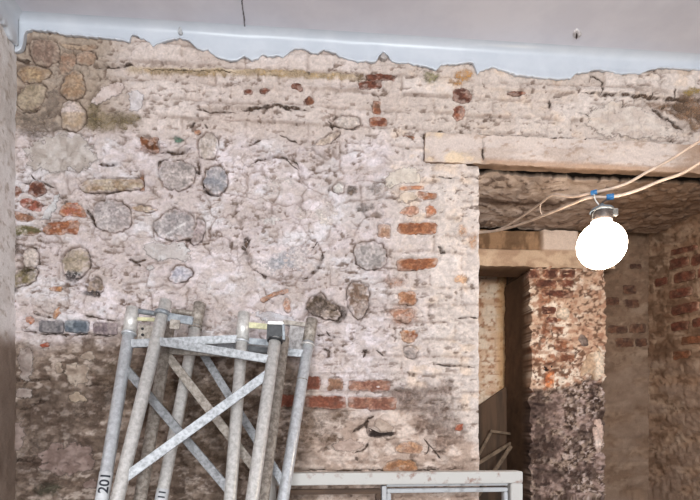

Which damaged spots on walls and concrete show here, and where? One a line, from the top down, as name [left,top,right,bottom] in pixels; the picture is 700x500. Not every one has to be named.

flaking render [0,0,700,81]
crack [585,76,688,144]
damp [34,483,60,495]